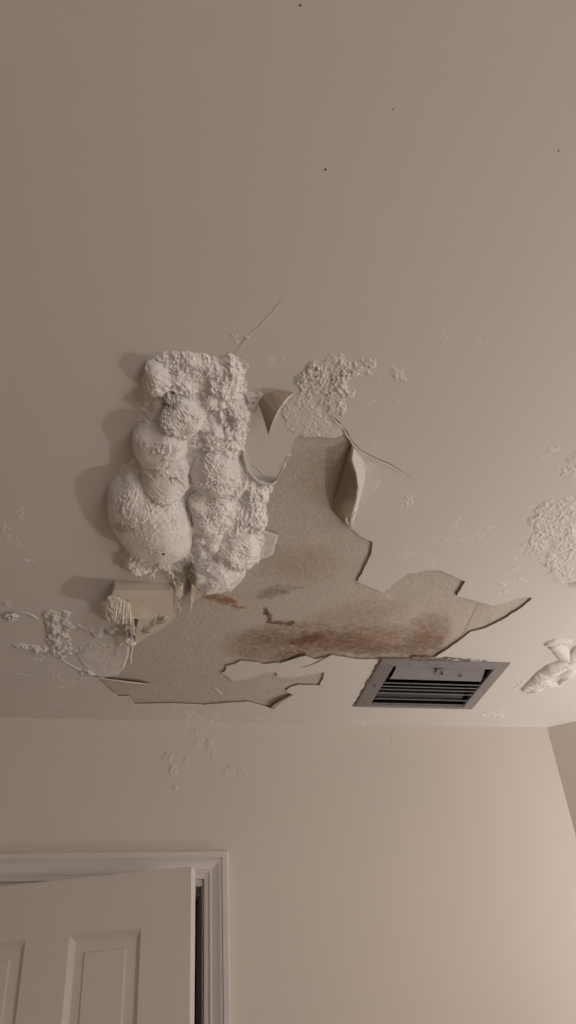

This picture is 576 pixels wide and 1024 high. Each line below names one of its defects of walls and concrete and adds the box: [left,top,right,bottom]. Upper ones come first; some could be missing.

crack [320,405,411,478]
peeling [75,434,530,707]
water stain [240,608,442,657]